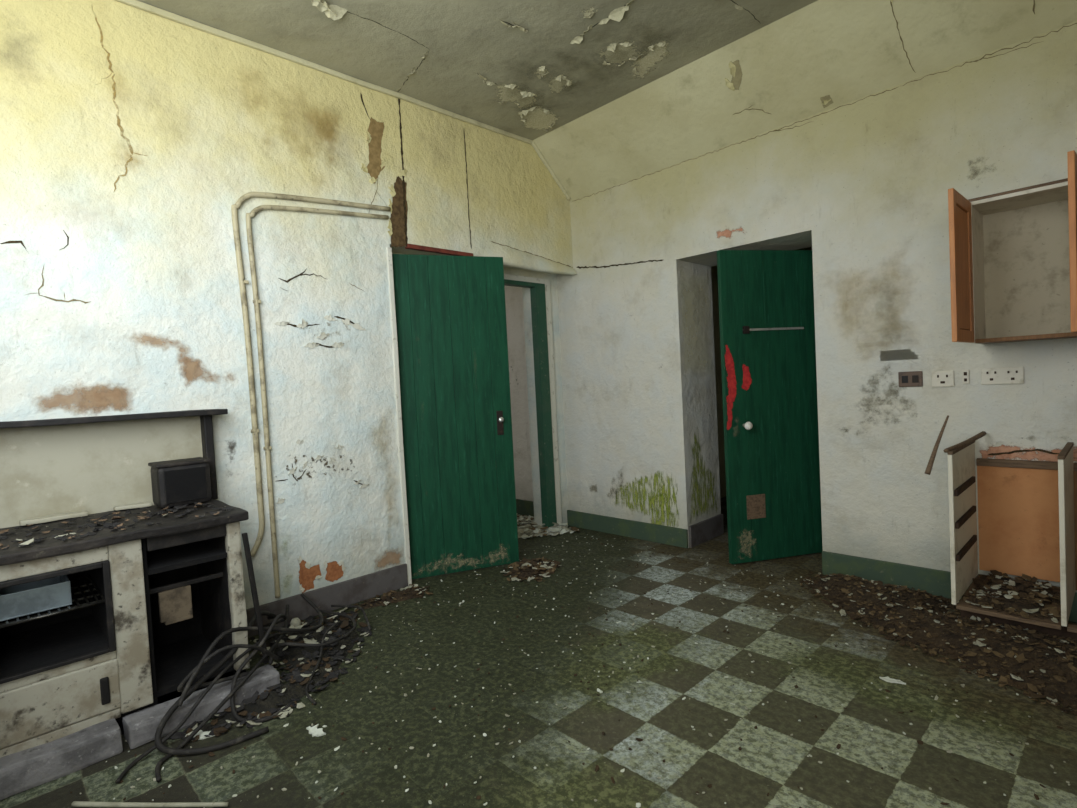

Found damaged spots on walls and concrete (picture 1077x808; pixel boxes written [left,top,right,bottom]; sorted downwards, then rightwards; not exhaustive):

peeling [570,0,634,44]
crack [95,17,146,191]
peeling [360,94,387,184]
peeling [478,73,559,132]
peeling [534,65,573,94]
peeling [599,40,671,78]
crack [572,23,1077,202]
damp [637,472,679,527]
spalling [298,556,346,593]